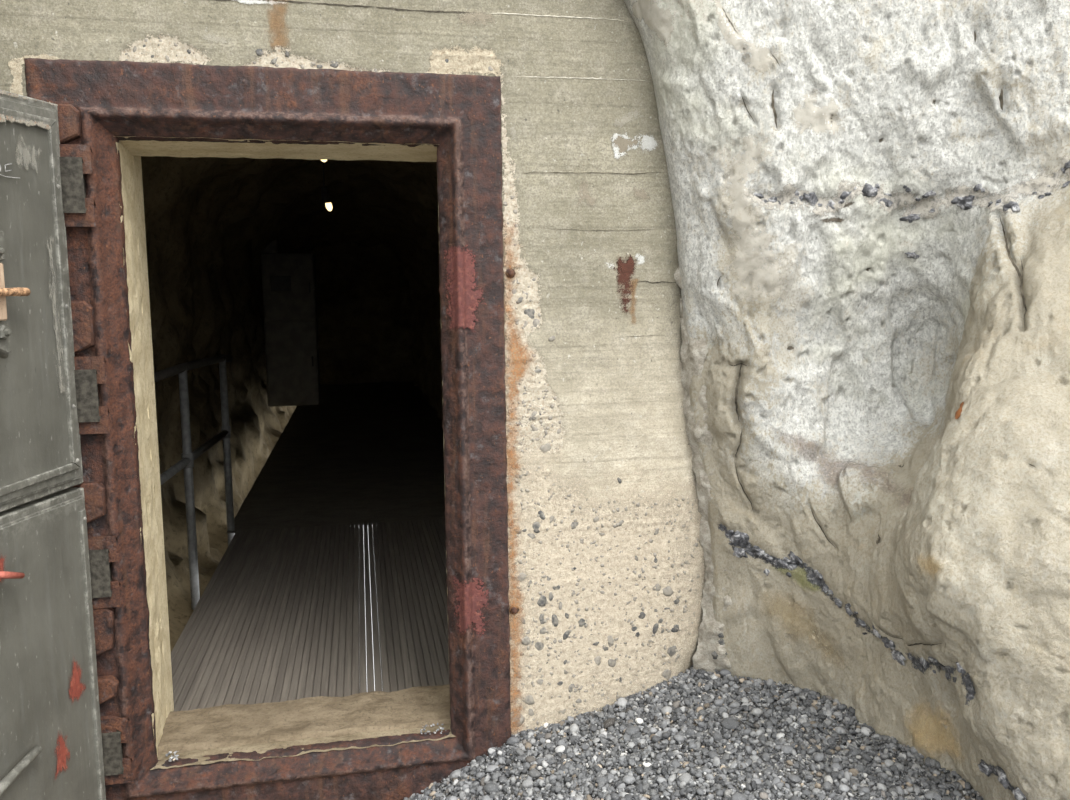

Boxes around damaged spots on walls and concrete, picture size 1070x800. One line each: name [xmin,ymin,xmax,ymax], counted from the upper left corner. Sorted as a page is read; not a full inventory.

crack [219,0,624,21]
spalling [119,33,211,65]
rust [613,253,638,319]
spalling [426,45,706,735]
rust [504,229,531,733]